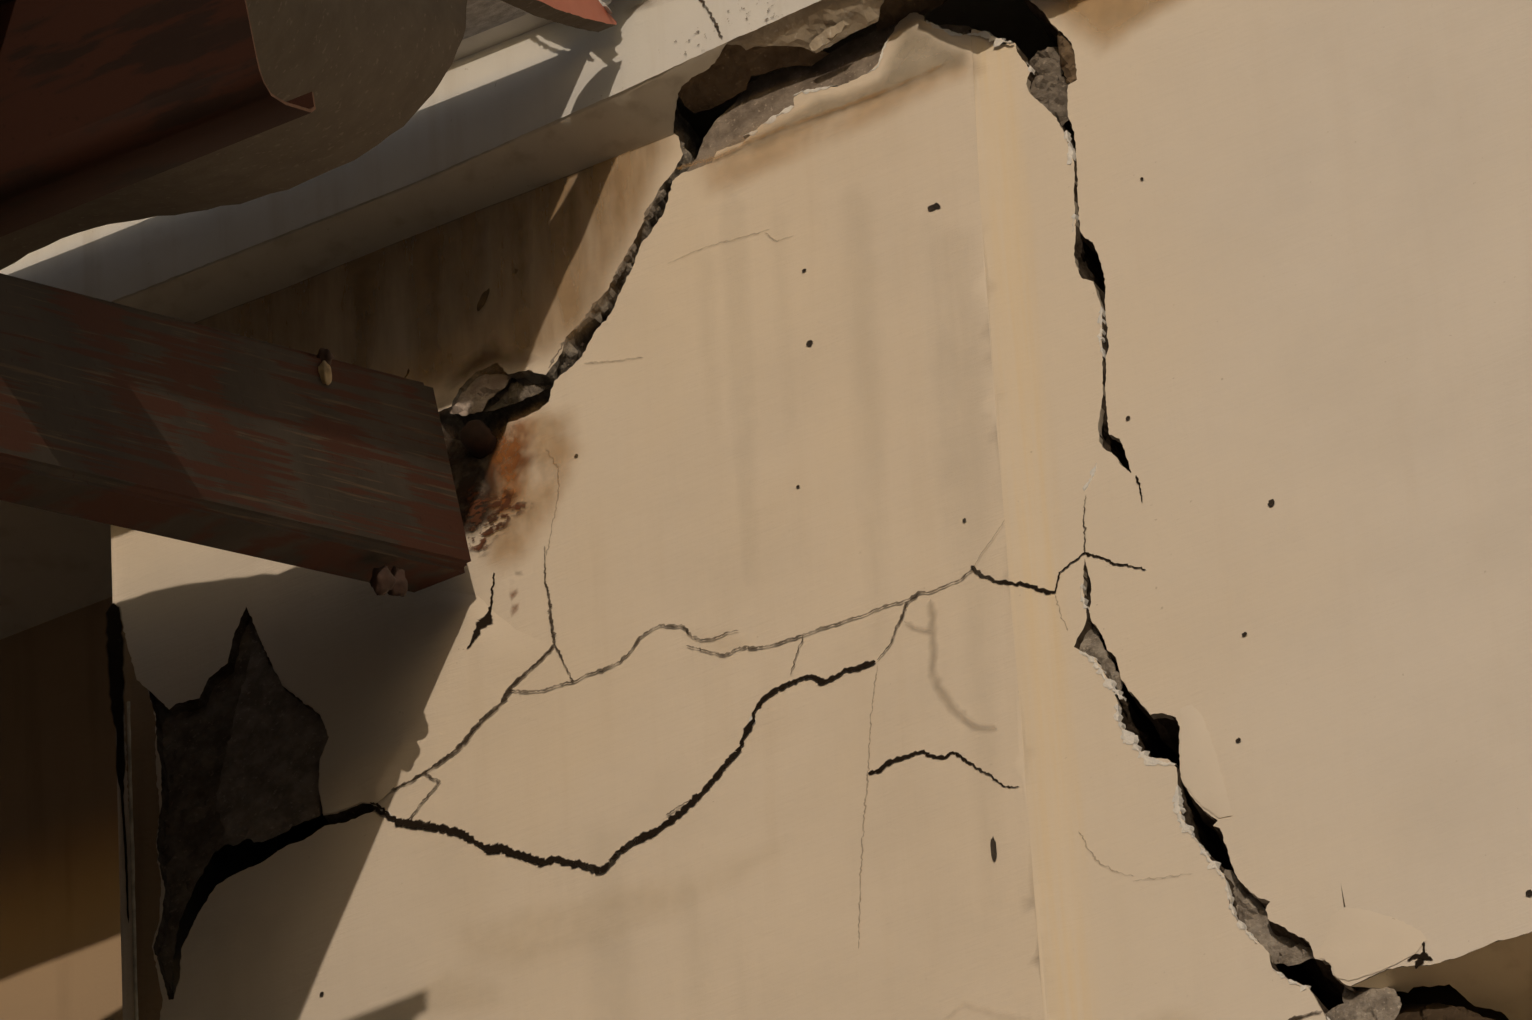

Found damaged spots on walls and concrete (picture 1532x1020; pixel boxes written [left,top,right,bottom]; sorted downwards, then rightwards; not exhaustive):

crack [439,105,702,439]
crack [699,0,723,38]
spalling [678,0,1013,172]
crack [1016,0,1142,502]
corrosion [443,423,528,551]
spalling [122,607,374,1020]
crack [370,496,1531,1020]
spalling [1272,968,1311,992]